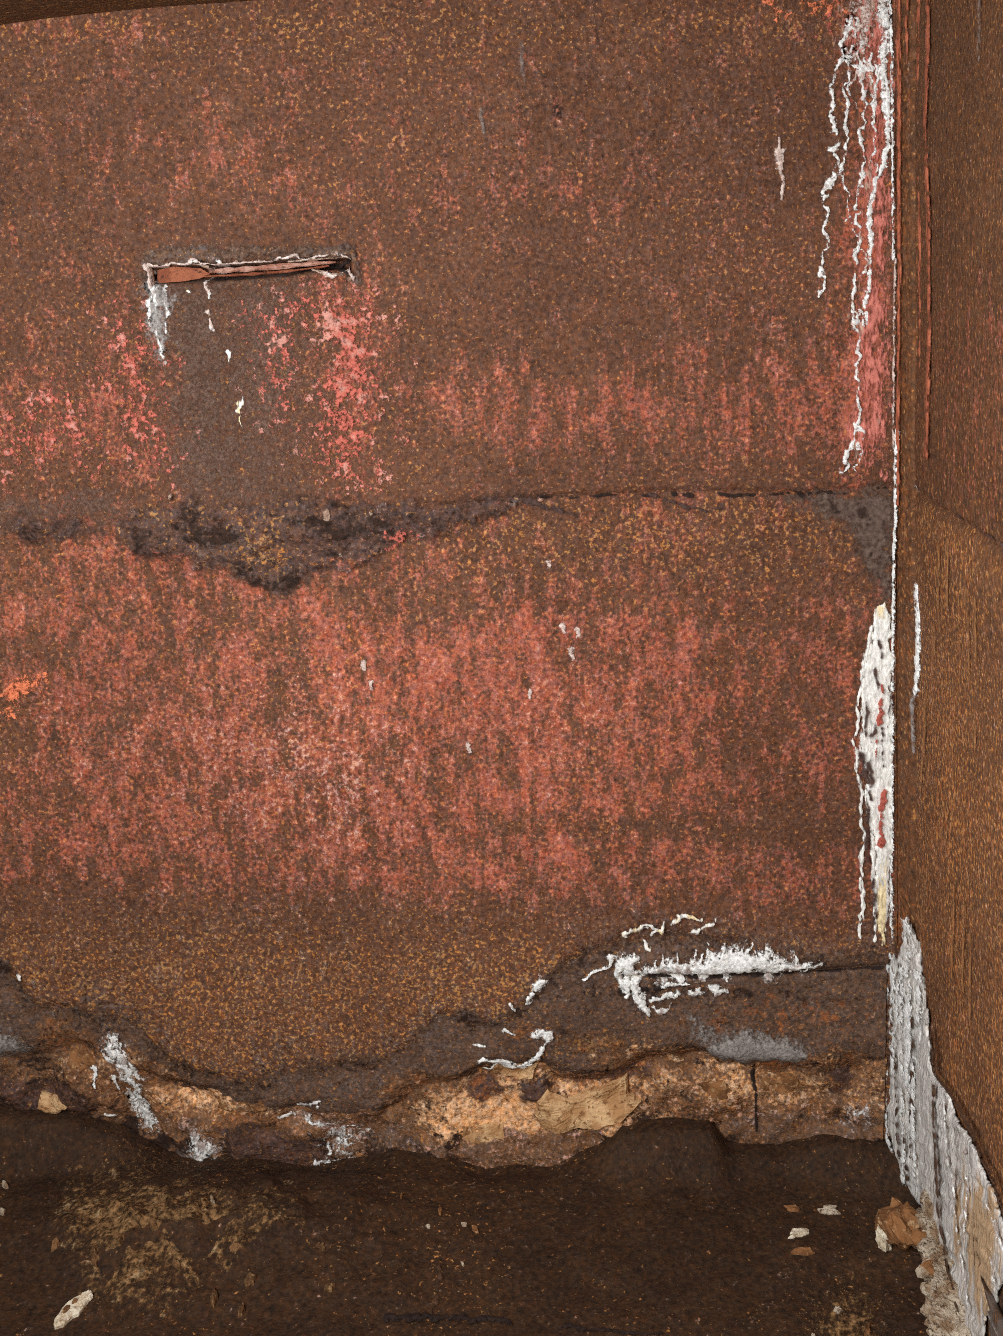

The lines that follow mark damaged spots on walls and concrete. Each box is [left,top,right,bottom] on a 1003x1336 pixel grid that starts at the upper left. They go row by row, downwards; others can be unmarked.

damp [145,277,293,498]
crack [510,486,887,518]
damp [787,0,921,946]
damp [582,914,823,1017]
damp [91,1031,158,1133]
spalling [0,917,1003,1336]